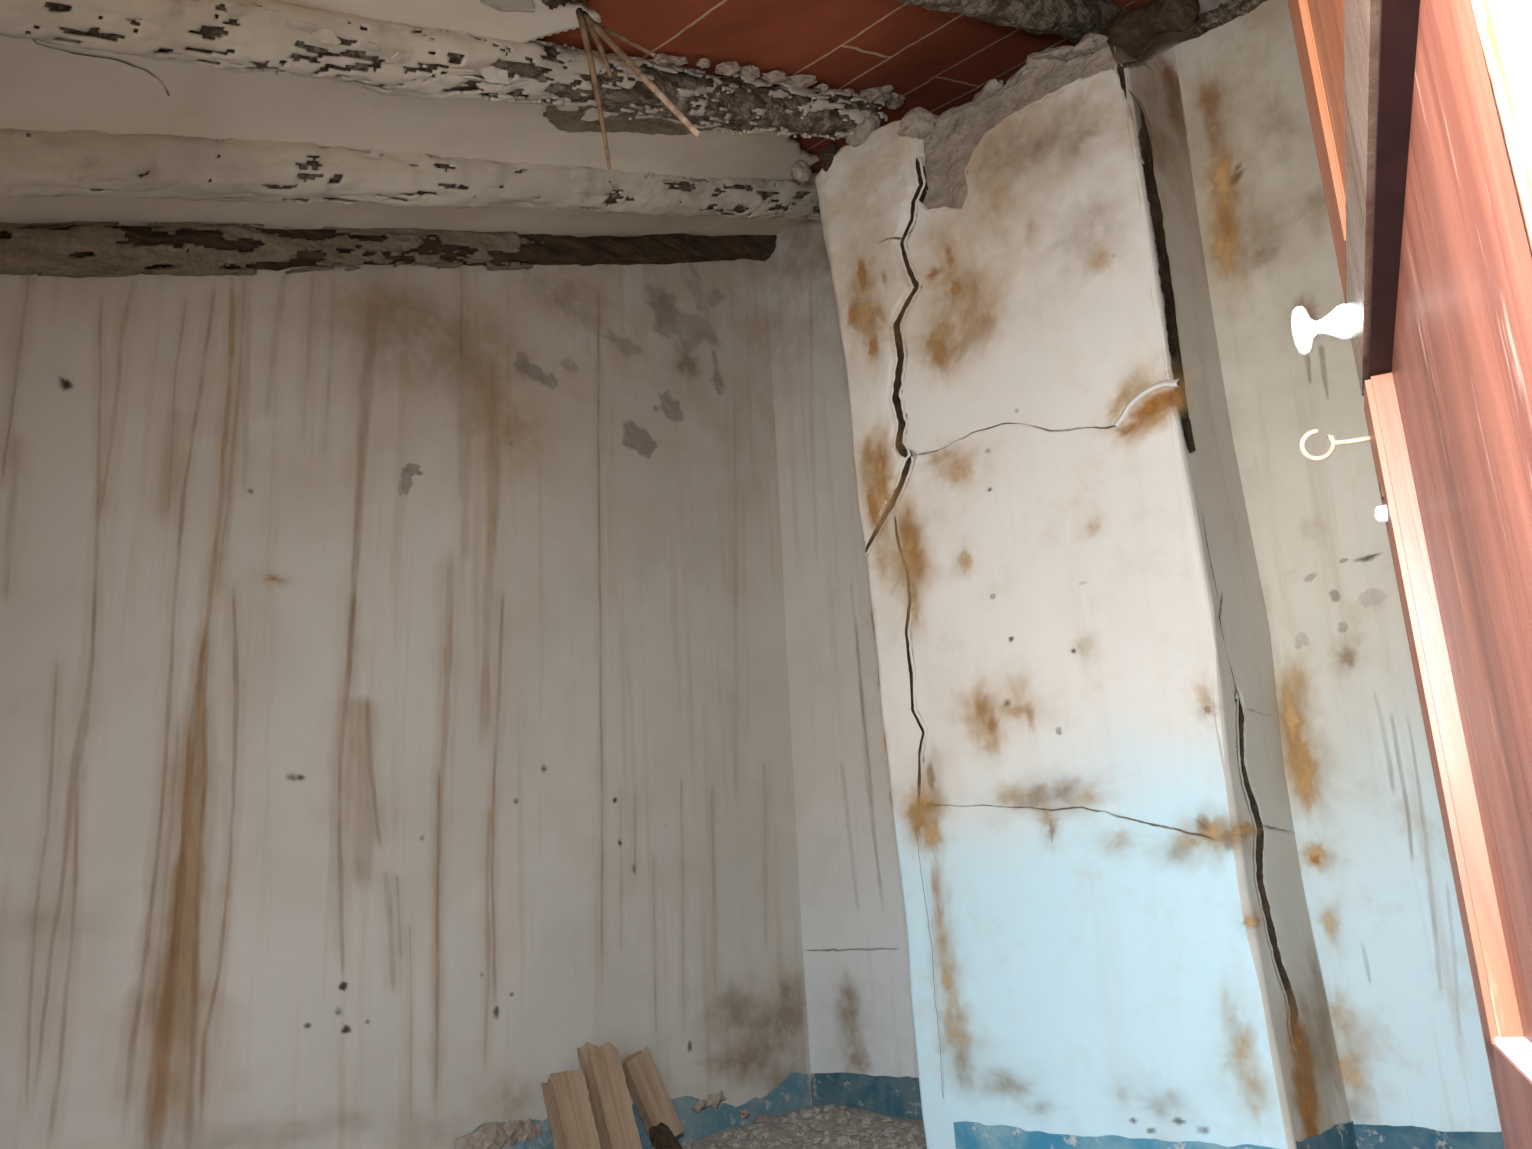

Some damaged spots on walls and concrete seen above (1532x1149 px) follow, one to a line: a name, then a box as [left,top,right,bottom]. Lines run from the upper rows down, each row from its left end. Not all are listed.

flaking render [446,66,717,135]
flaking render [917,46,1119,213]
crack [1117,64,1196,453]
corrosion [1208,109,1237,271]
corrosion [865,450,886,526]
corrosion [1125,391,1182,434]
crack [865,156,1210,1099]
crack [1203,520,1300,1045]
corrosion [1283,687,1315,797]
corrosion [1310,846,1323,864]